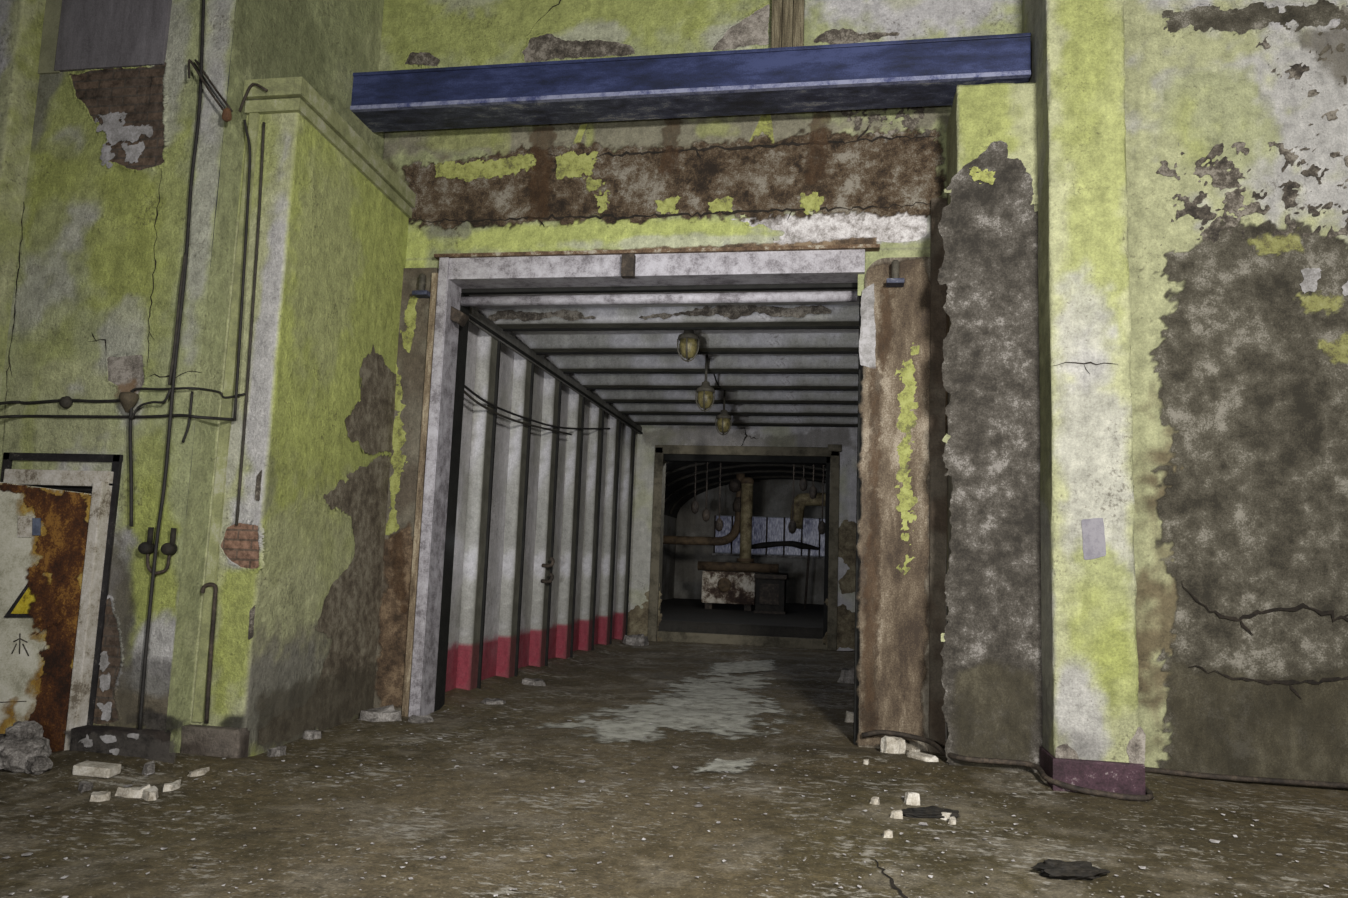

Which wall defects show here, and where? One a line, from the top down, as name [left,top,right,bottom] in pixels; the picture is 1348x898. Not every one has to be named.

spalling [1158,0,1348,97]
spalling [68,59,171,175]
corrosion [402,124,947,230]
peeling [1127,104,1348,769]
corrosion [857,256,948,747]
corrosion [0,483,92,752]
spalling [93,593,127,726]
corrosion [374,523,413,708]
leakage [1167,668,1348,791]
crack [1182,583,1348,635]
crack [1190,665,1348,699]
crack [871,858,908,898]